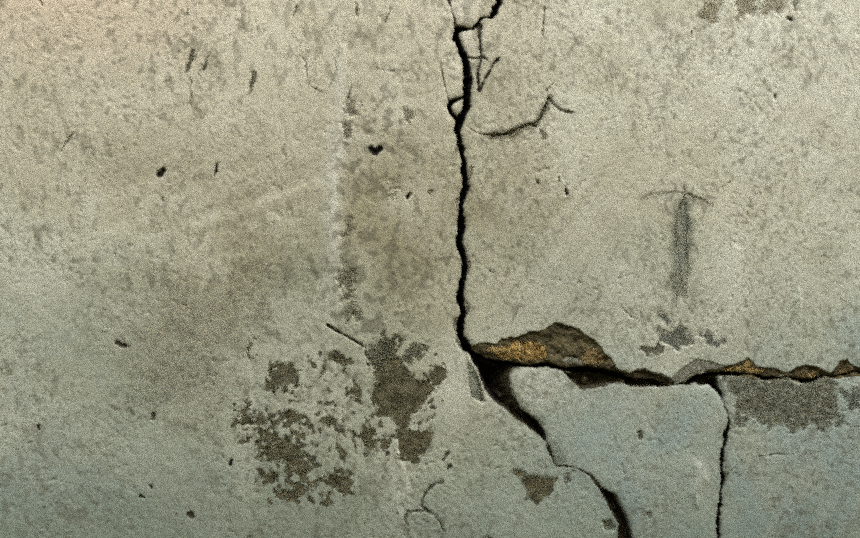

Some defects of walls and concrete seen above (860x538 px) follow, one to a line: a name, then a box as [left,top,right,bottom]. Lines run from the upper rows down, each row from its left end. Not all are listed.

crack [442,0,860,538]
peeling [456,322,860,434]
peeling [641,310,727,356]
crack [404,481,444,529]